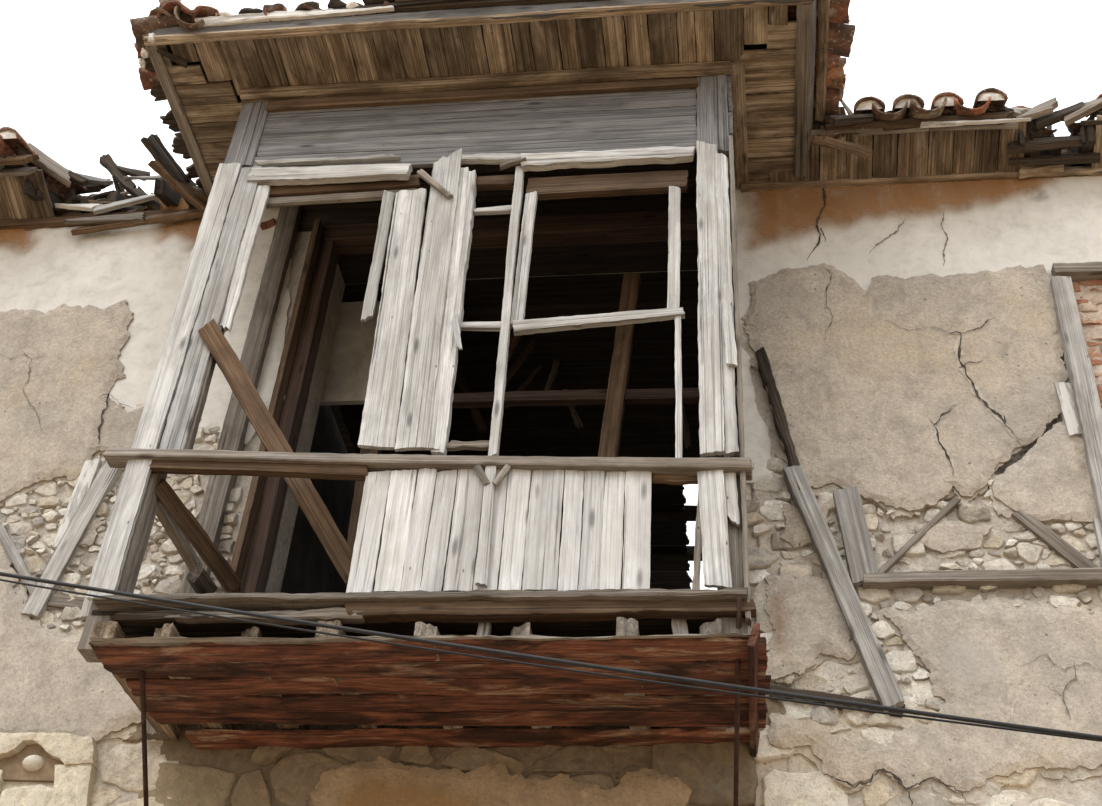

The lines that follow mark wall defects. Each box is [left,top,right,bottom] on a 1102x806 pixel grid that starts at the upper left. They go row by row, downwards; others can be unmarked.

crack [807,187,833,338]
water stain [752,159,1054,245]
crack [940,213,948,265]
crack [1,349,68,430]
crack [886,317,1062,487]
spalling [0,476,79,604]
spalling [31,468,125,639]
spalling [134,516,186,595]
spalling [166,474,210,521]
spalling [860,448,1073,573]
spalling [91,584,1102,806]
crack [1020,654,1102,720]